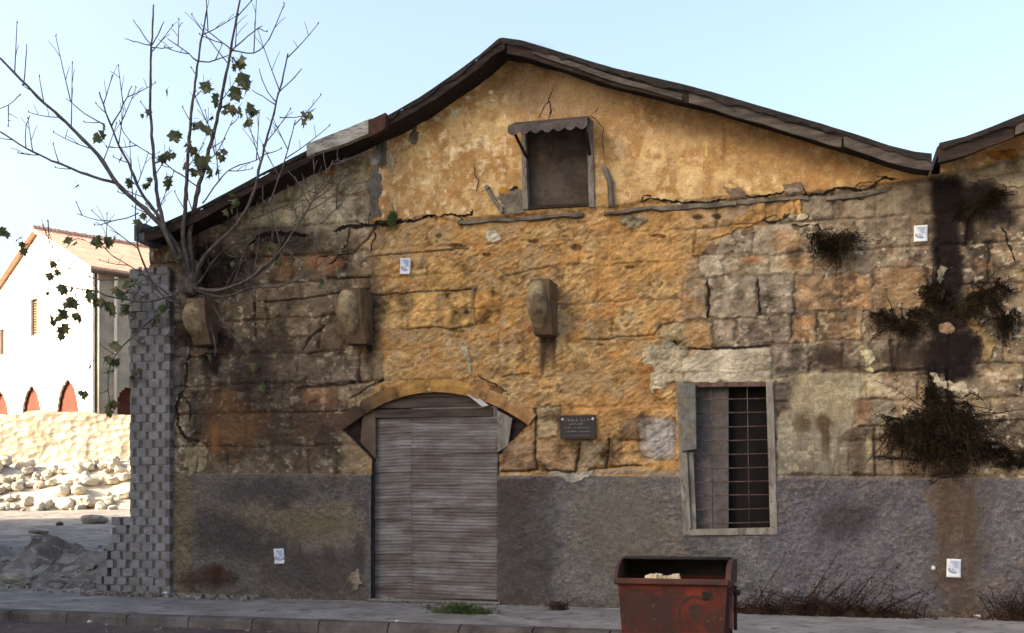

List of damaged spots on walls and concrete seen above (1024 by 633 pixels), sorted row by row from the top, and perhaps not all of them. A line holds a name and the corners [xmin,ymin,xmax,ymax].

spalling [366,140,396,220]
peeling [686,181,808,256]
crack [641,175,898,228]
water stain [924,178,982,412]
crack [174,347,204,443]
spalling [860,350,875,372]
spalling [930,372,969,394]
spalling [938,317,995,363]